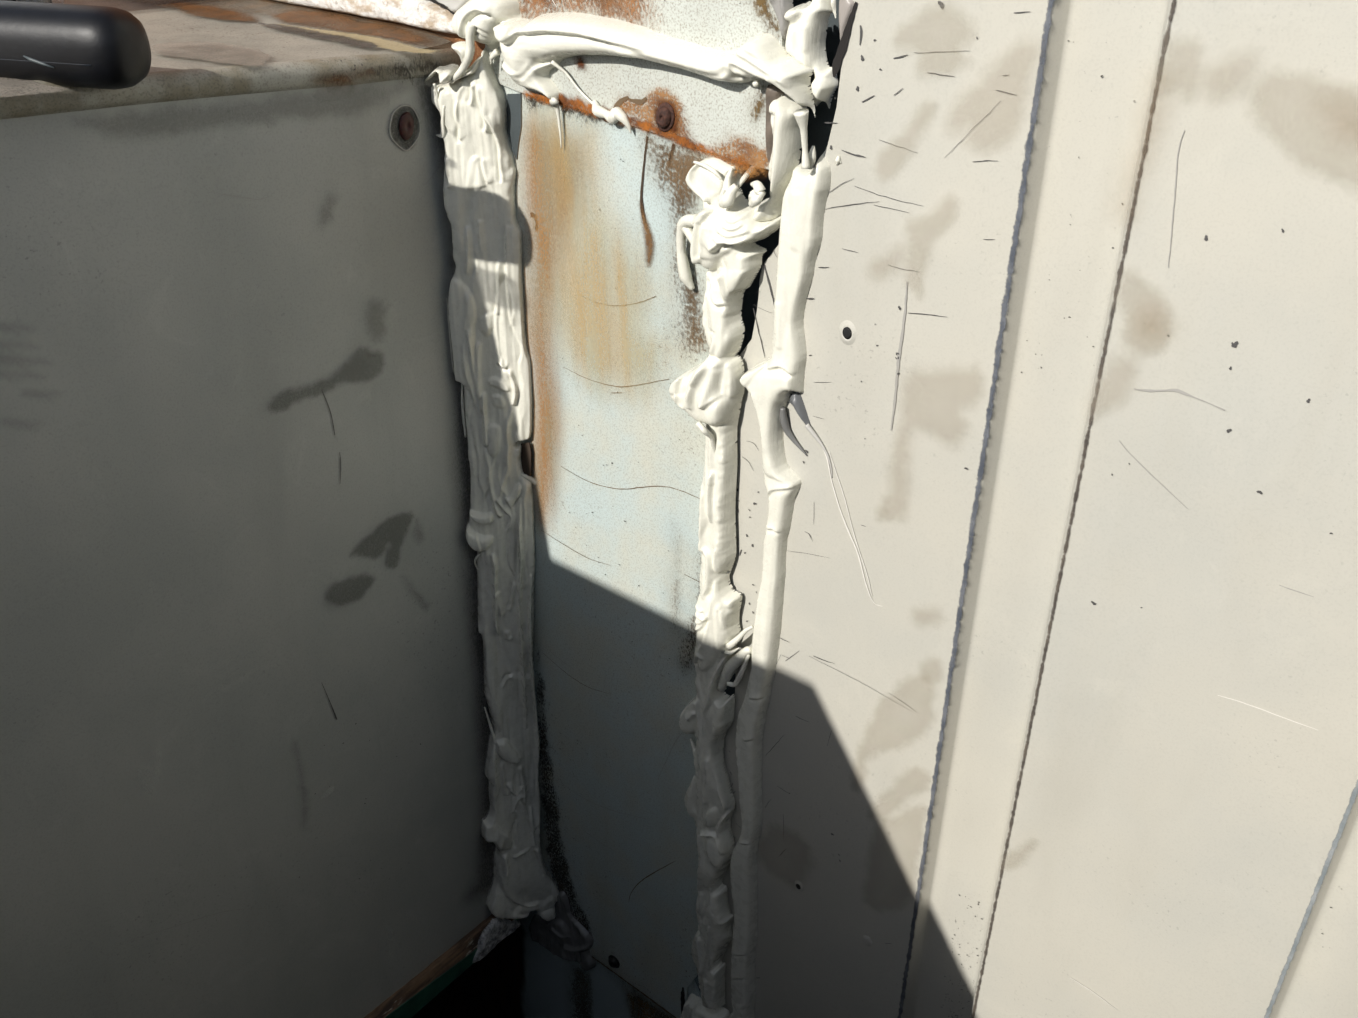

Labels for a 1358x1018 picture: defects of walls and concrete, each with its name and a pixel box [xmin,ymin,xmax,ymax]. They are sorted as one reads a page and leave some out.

rust [519,0,648,23]
rust [753,0,780,37]
rust [525,86,769,234]
rust [641,212,653,264]
rust [528,130,573,520]
rust [673,253,707,353]